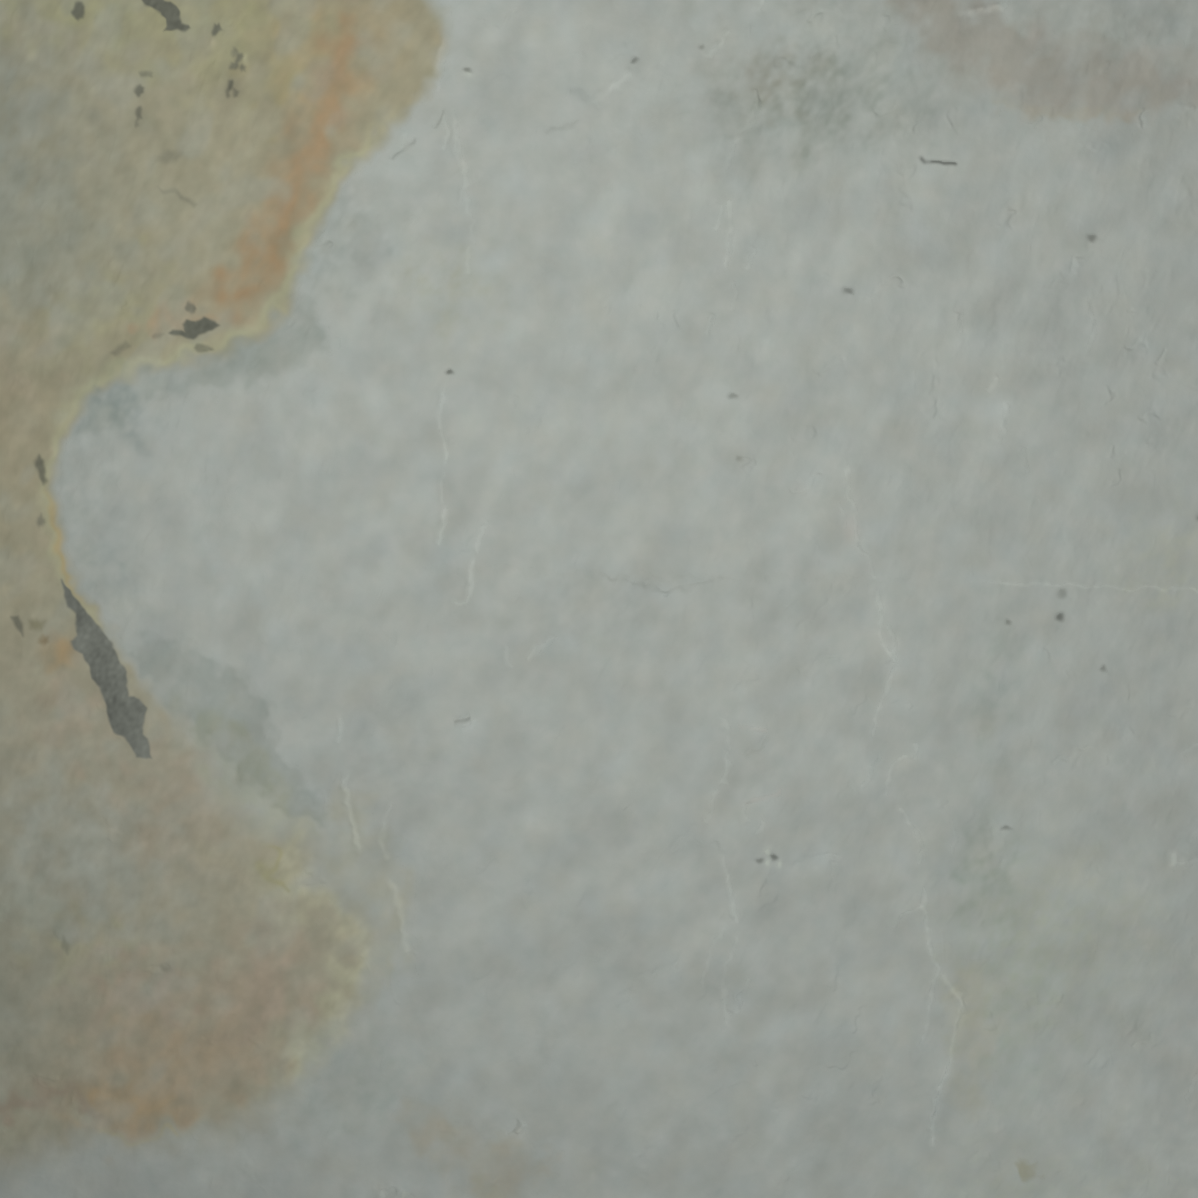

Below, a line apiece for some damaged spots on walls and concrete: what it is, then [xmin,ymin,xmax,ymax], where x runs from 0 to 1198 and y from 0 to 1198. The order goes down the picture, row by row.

leakage [0,0,454,1188]
leakage [881,0,1198,143]